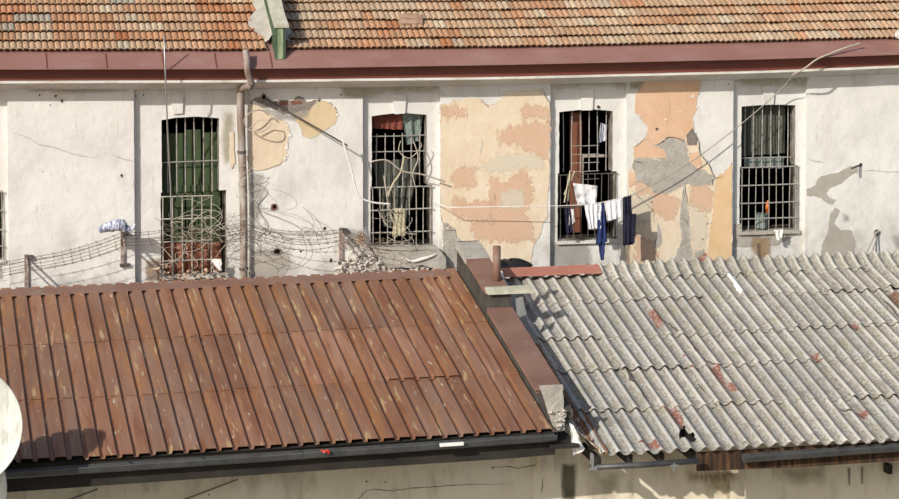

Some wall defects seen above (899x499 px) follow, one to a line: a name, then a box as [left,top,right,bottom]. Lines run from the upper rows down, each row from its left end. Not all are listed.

peeling [248,93,342,171]
peeling [438,89,552,270]
peeling [626,81,797,264]
flaking render [345,233,432,274]
corrosion [0,260,555,463]
spalling [548,408,567,433]
leakage [562,464,575,499]